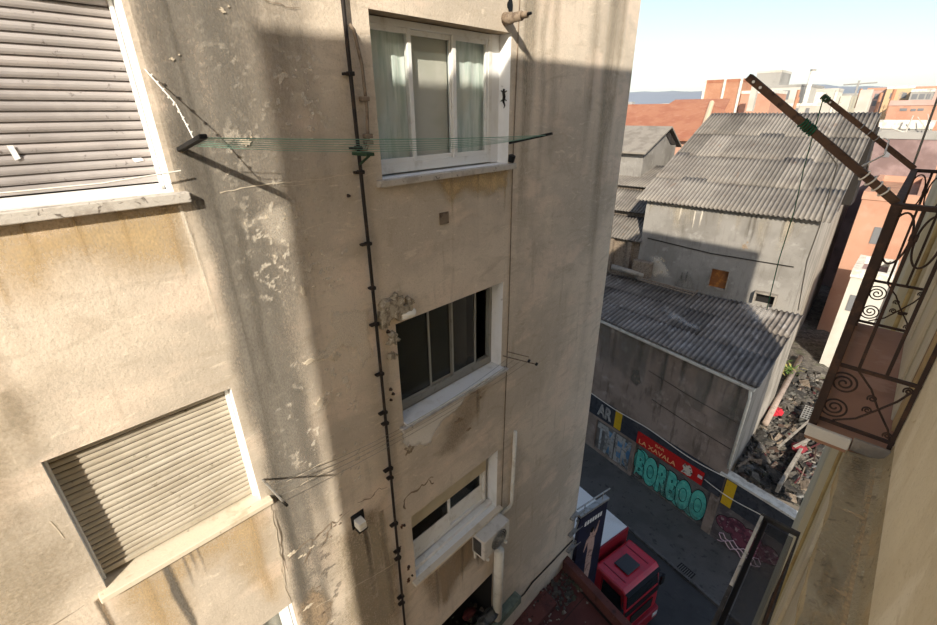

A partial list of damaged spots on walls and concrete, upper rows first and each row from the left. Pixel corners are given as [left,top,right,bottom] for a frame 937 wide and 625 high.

water stain [133,0,319,625]
crack [270,477,434,603]